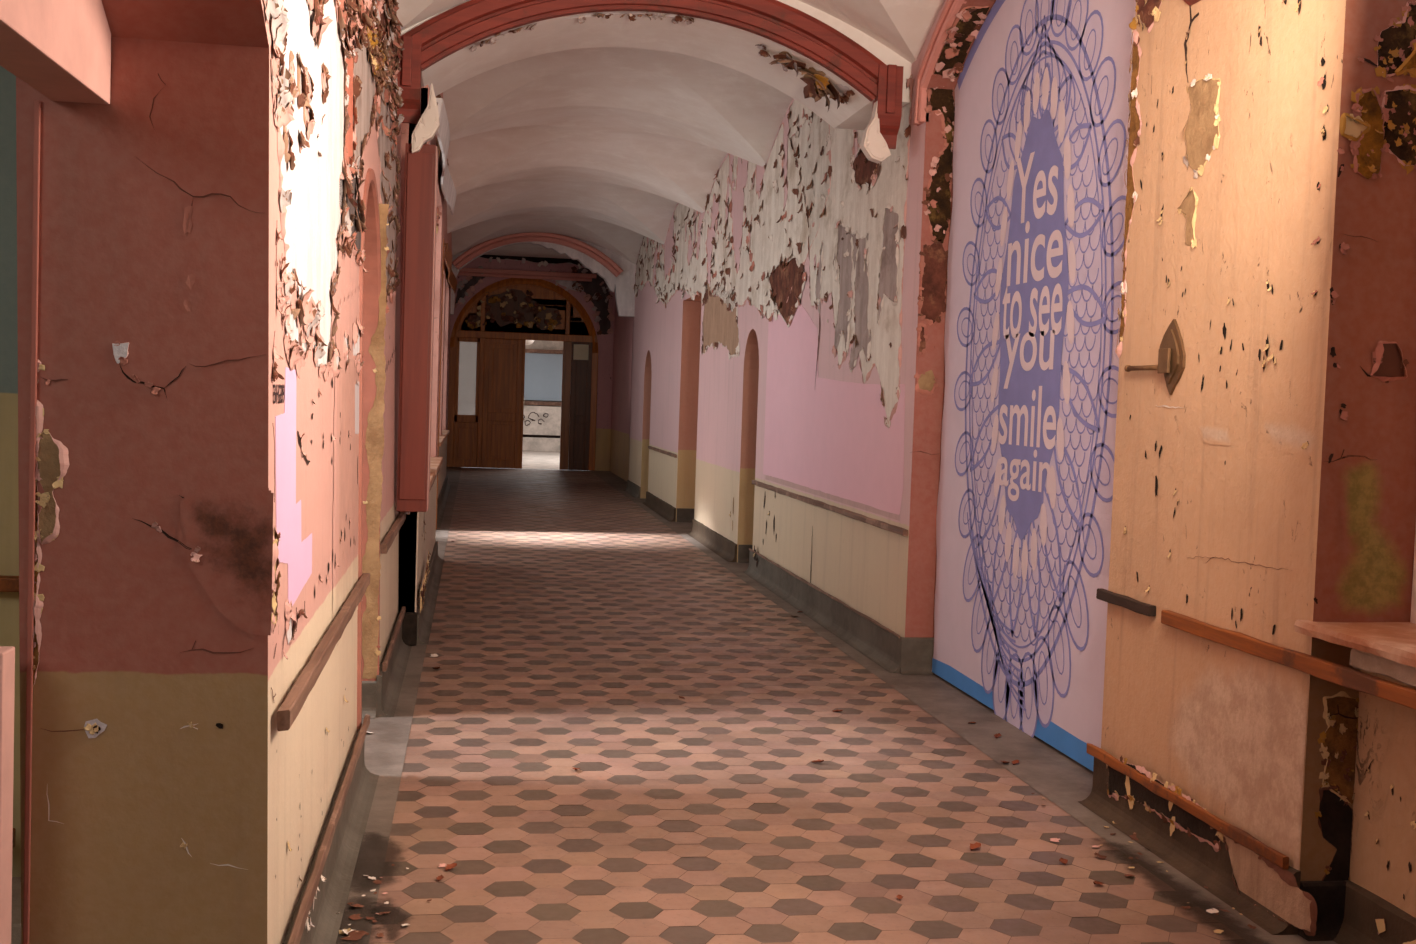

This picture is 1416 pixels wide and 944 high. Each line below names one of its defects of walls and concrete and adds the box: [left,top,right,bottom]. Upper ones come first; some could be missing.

peeling [564,11,694,25]
peeling [1317,0,1416,180]
crack [120,74,318,398]
peeling [263,0,405,420]
peeling [454,255,615,336]
peeling [633,0,994,428]
spalling [1311,287,1339,305]
flaking render [29,400,69,685]
mould [1328,451,1412,622]
flaking render [1106,647,1370,881]